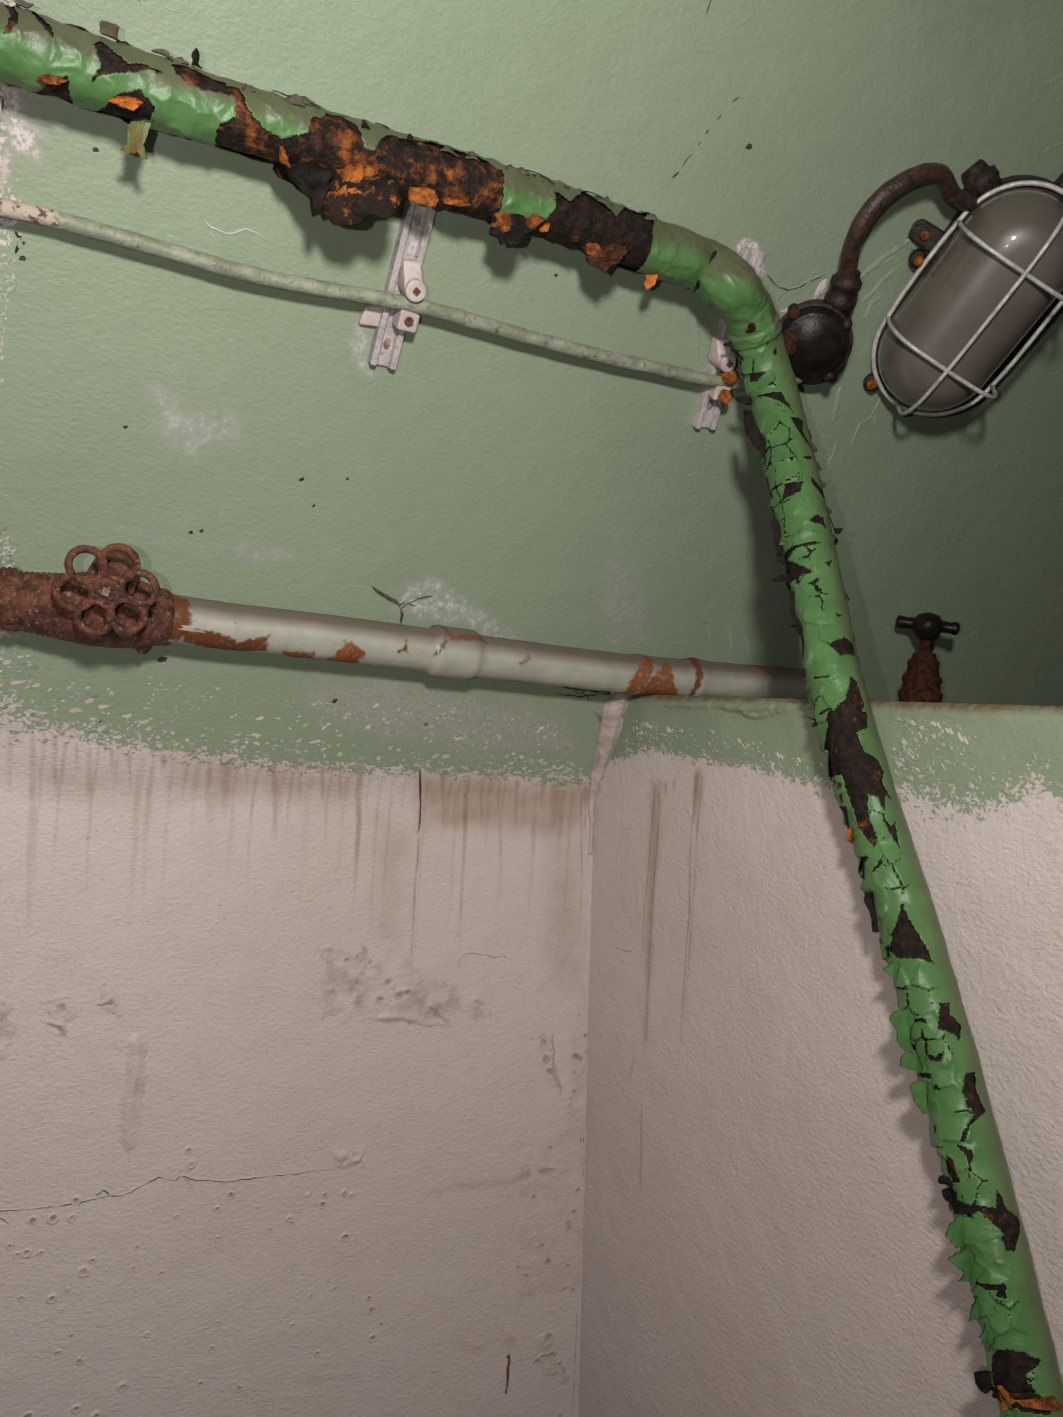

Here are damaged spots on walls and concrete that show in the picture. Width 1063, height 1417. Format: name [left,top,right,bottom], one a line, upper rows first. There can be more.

crack [0,1168,338,1227]